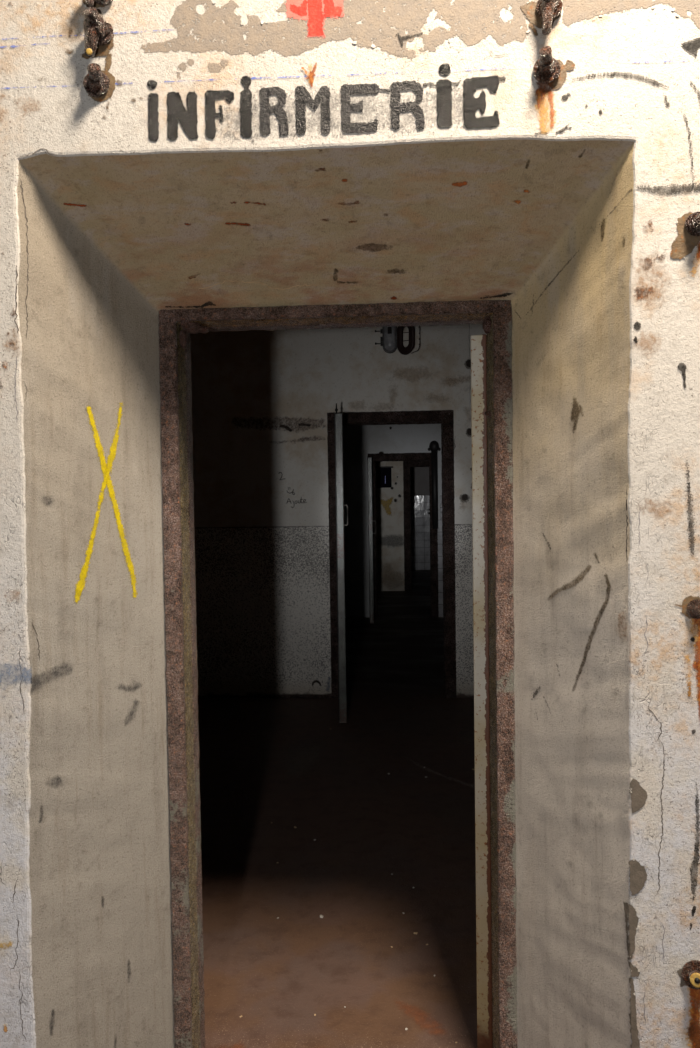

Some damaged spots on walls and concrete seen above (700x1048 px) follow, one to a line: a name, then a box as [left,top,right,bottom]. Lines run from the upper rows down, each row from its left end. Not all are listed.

peeling [141,0,700,78]
rust [535,81,556,132]
rust [685,618,700,714]
rust [687,988,700,1048]